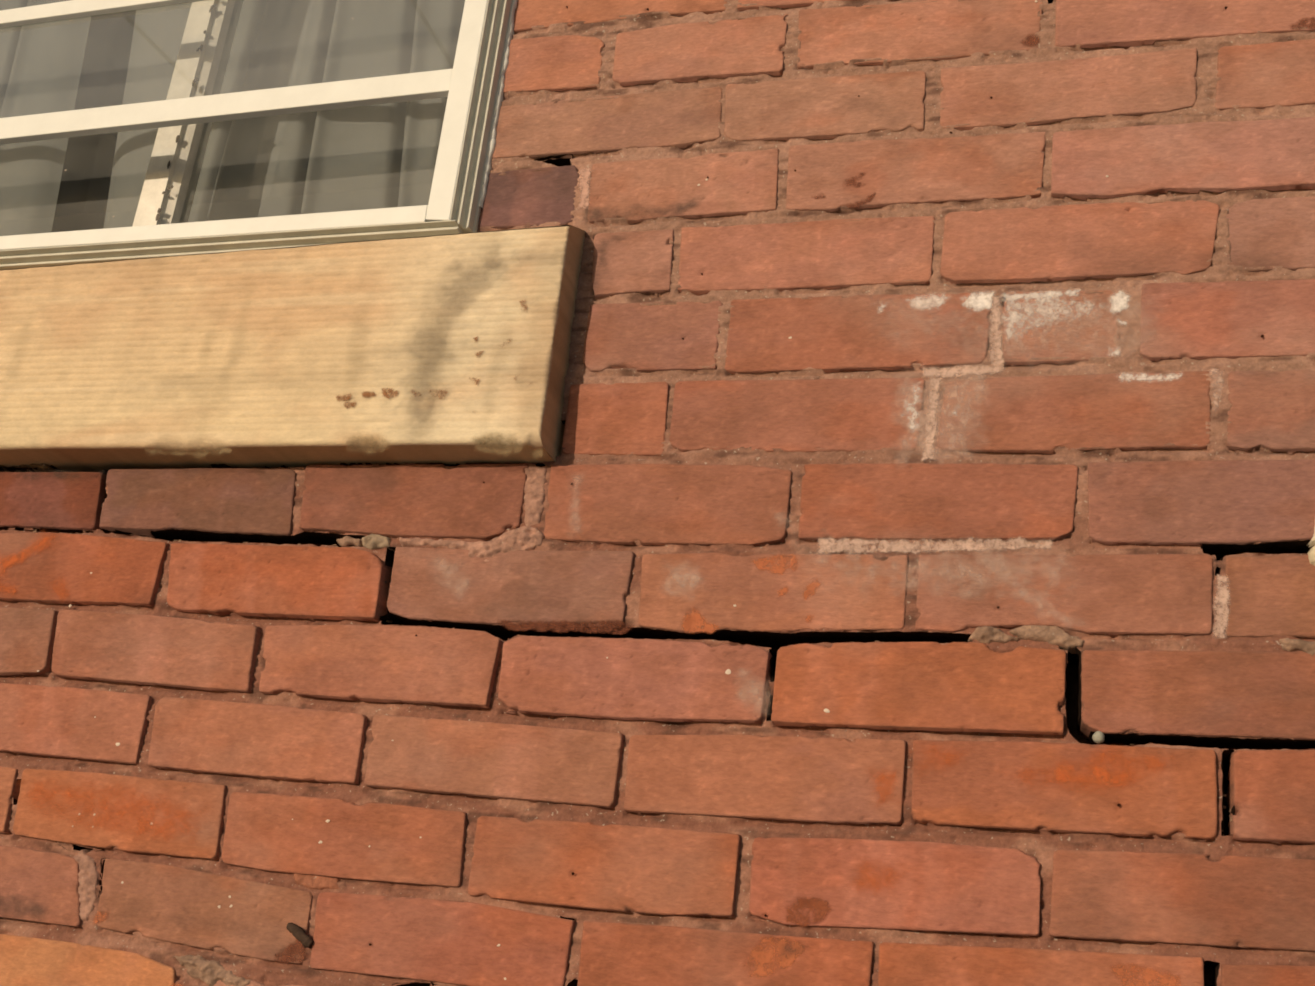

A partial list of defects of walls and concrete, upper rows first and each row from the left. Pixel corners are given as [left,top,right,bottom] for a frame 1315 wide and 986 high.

water stain [1111,291,1128,312]
water stain [908,291,1092,460]
crack [0,464,64,472]
crack [210,462,233,470]
crack [340,461,545,469]
crack [1201,540,1313,576]
crack [0,469,972,721]
crack [1059,647,1315,836]